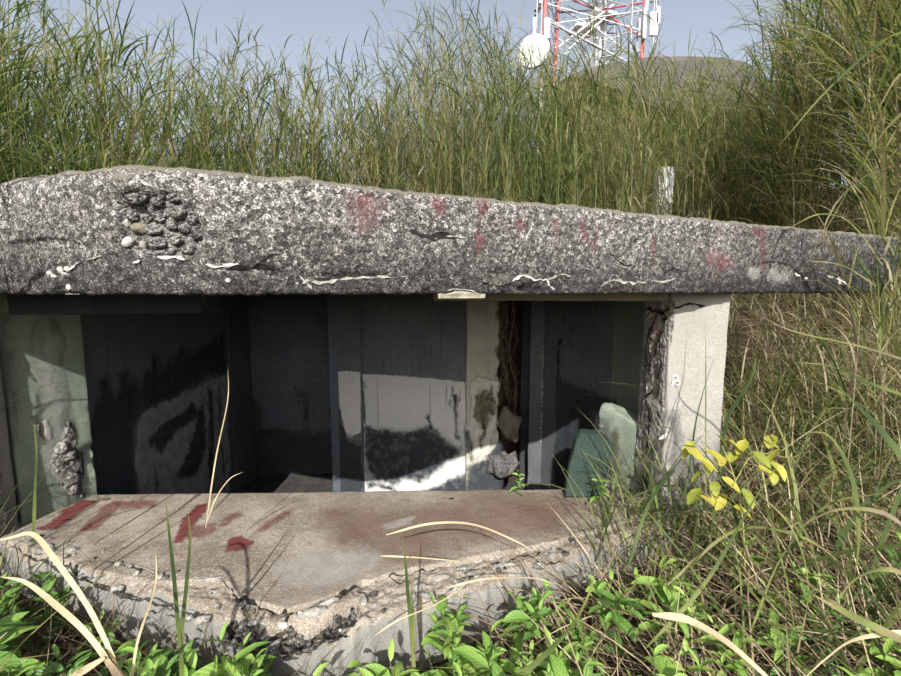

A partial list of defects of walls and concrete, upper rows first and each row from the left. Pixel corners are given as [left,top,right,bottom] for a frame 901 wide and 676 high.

spalling [119,190,204,263]
crack [410,230,467,240]
crack [600,253,687,294]
crack [640,302,706,458]
spalling [49,420,83,498]
crack [14,529,605,640]